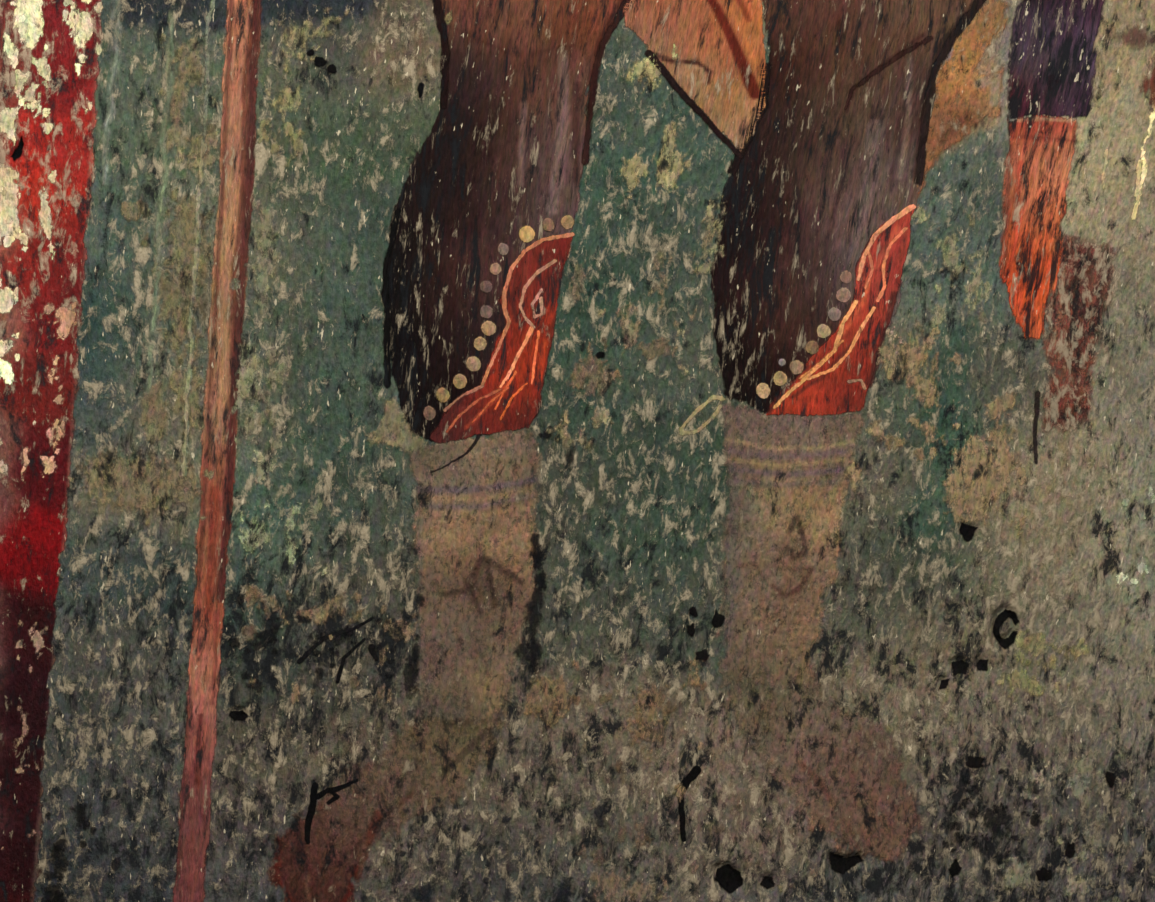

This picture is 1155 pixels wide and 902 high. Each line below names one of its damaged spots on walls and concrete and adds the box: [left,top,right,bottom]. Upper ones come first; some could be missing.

peeling [63,0,103,76]
peeling [38,170,57,260]
peeling [0,279,19,313]
peeling [40,301,77,340]
peeling [0,332,20,384]
peeling [48,355,64,405]
peeling [68,187,215,526]
peeling [0,419,65,481]
peeling [16,620,48,673]